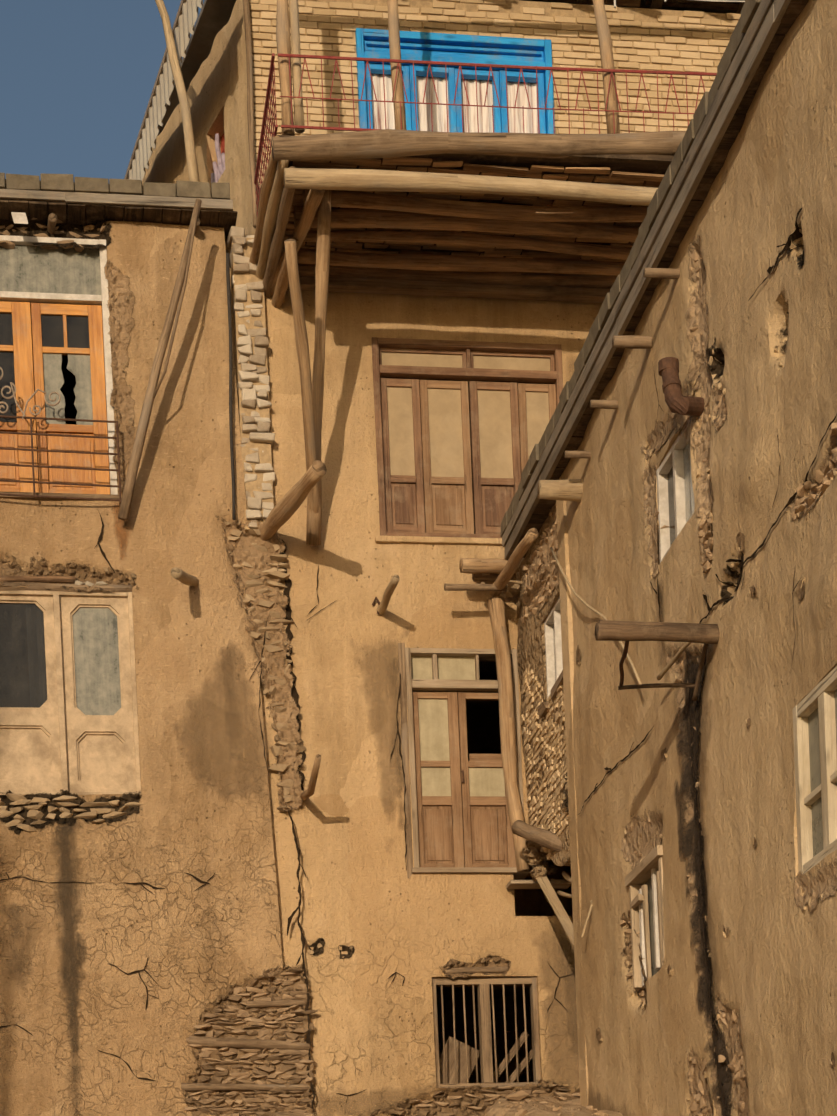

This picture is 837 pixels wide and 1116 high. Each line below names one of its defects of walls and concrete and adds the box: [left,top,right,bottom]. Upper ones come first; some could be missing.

spalling [641,235,757,606]
crack [685,414,837,643]
leakage [56,825,85,1088]
crack [110,955,159,1011]
crack [123,872,216,894]
spalling [181,966,318,1116]
crack [250,540,364,1115]
spalling [307,938,355,959]
crack [578,726,654,815]
spalling [619,910,647,1011]
leakage [675,652,732,1116]
flaking render [686,997,749,1116]